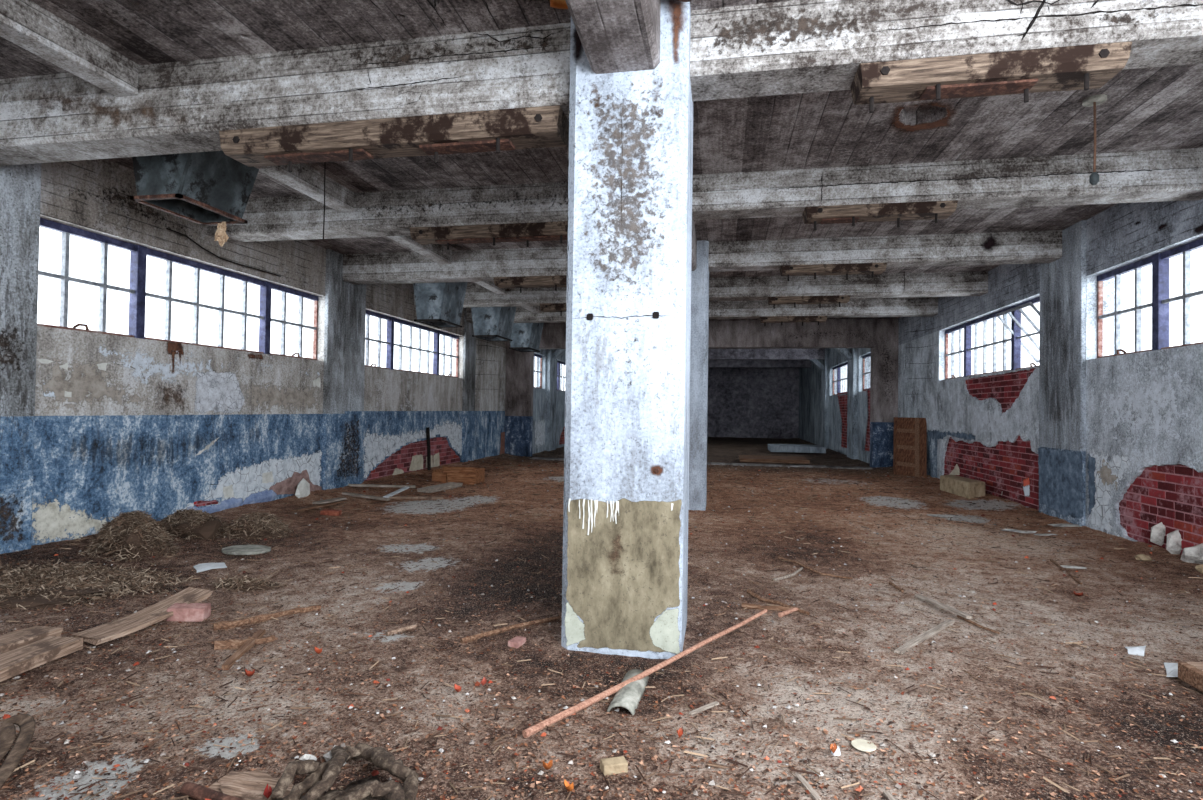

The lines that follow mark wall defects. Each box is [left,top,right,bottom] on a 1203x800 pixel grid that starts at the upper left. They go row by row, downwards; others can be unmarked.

leakage [574,80,670,297]
corrosion [159,341,184,409]
flaking render [363,420,462,482]
flaking render [928,358,1203,555]
leakage [608,536,622,573]
leakage [564,602,585,646]
leakage [650,608,681,654]